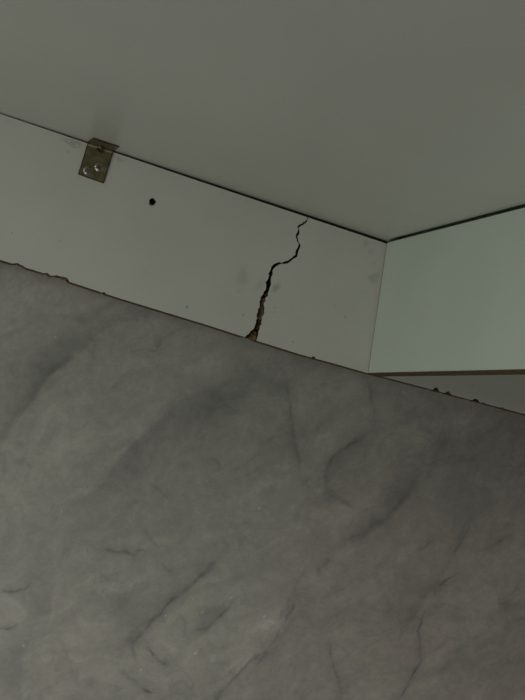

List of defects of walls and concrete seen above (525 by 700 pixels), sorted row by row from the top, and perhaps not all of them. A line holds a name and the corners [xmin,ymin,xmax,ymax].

crack [244,217,308,341]